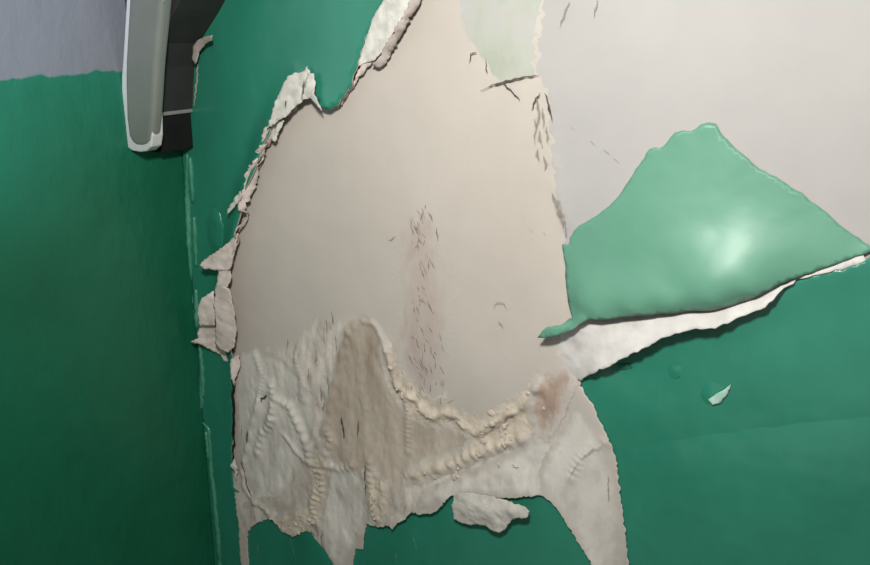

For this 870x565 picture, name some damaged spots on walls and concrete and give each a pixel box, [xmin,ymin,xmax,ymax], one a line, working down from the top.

peeling [191,0,870,565]